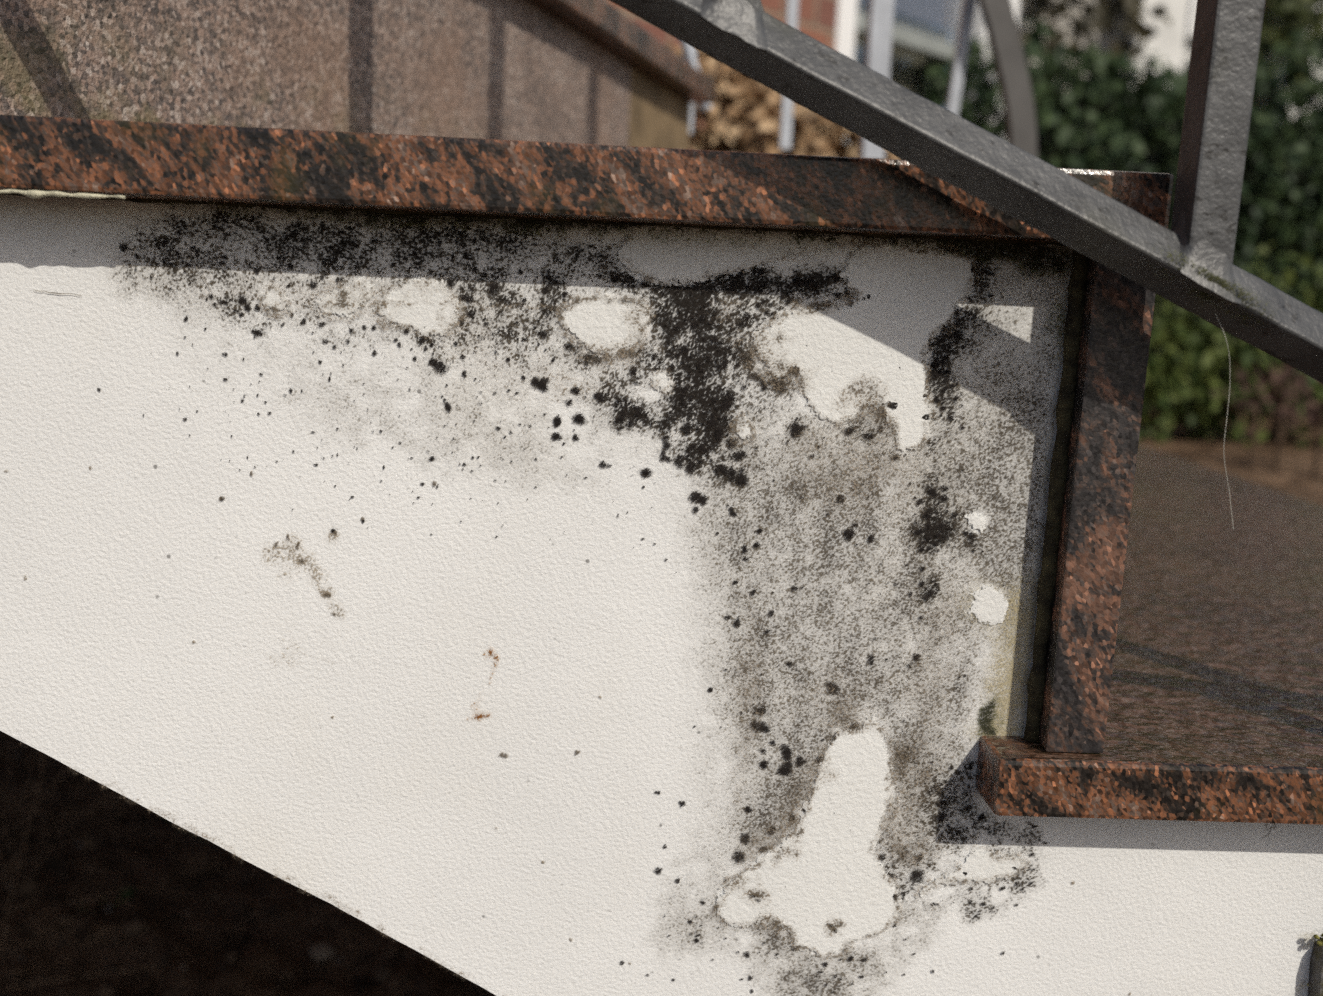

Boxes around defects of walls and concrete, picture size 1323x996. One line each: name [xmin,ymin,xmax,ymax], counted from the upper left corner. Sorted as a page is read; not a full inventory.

leakage [115,204,1069,996]